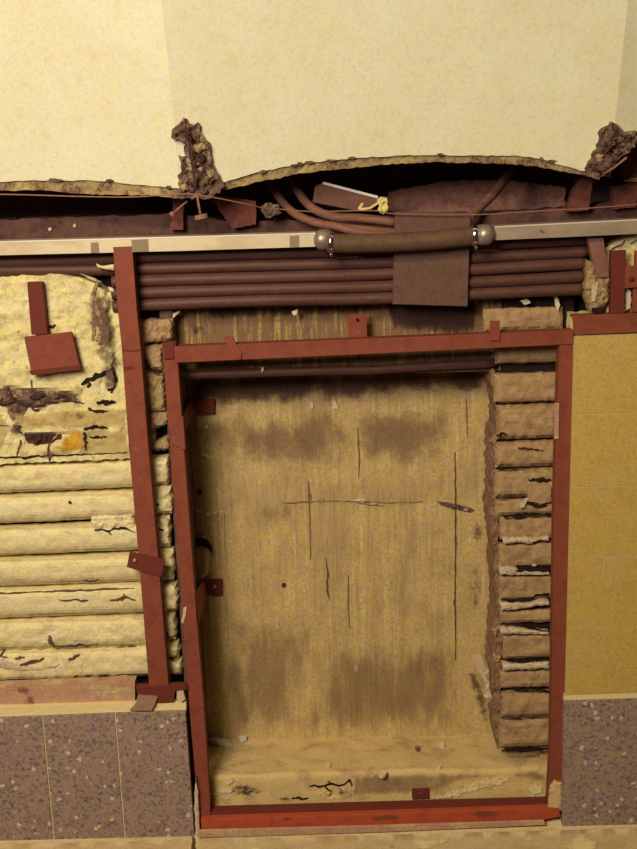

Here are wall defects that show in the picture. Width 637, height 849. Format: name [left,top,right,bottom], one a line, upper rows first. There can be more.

peeling [179,127,210,194]
peeling [589,141,614,175]
flaking render [0,388,80,421]
spalling [25,433,62,446]
crack [354,428,362,478]
flaking render [518,483,552,508]
crack [281,482,424,622]
spalling [437,368,512,749]
water stain [470,674,486,714]
crack [291,779,352,800]